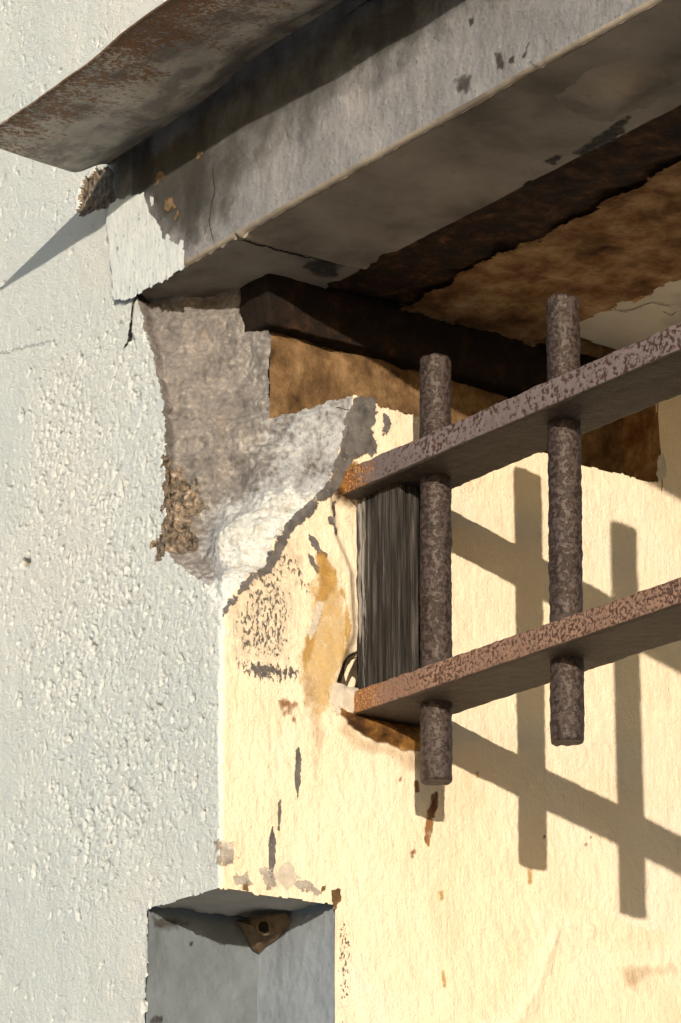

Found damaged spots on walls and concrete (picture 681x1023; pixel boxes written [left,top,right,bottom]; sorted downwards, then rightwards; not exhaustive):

leakage [495,43,529,69]
leakage [458,76,470,92]
leakage [111,0,443,227]
leakage [304,260,339,277]
spalling [76,166,420,616]
spalling [451,380,509,424]
spalling [581,403,666,491]
rust [331,462,358,501]
rust [302,553,351,714]
rust [340,708,420,751]
rust [424,792,438,846]
peeling [233,859,341,910]